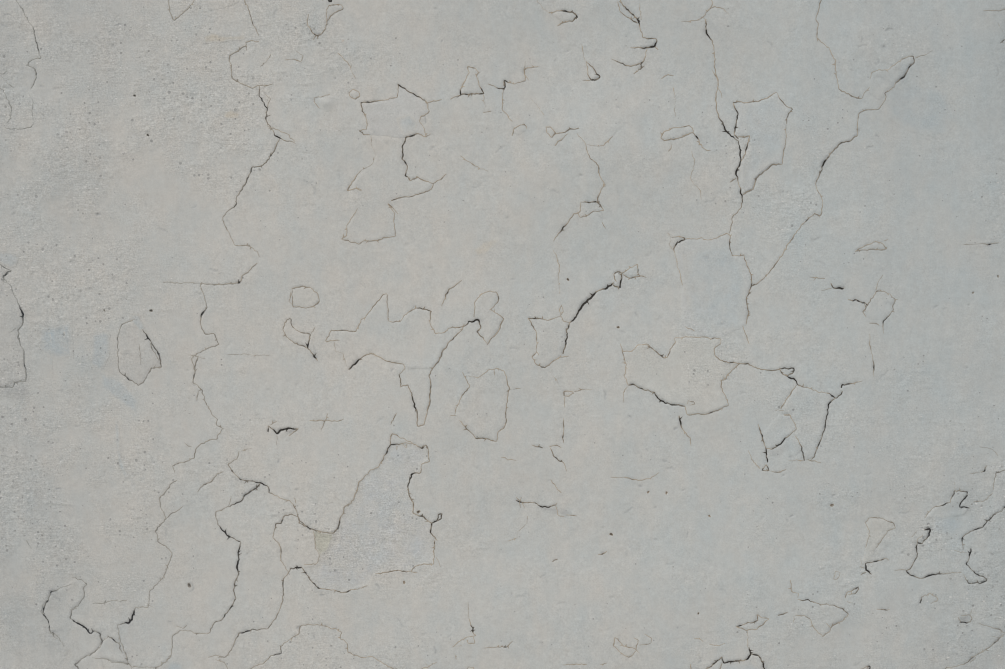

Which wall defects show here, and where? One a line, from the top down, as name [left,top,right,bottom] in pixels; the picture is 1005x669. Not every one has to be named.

peeling [537,1,578,26]
peeling [427,66,490,113]
peeling [733,92,793,194]
crack [705,1,876,398]
peeling [611,264,644,289]
peeling [748,386,835,473]
peeling [895,469,1005,584]
peeling [40,577,131,669]